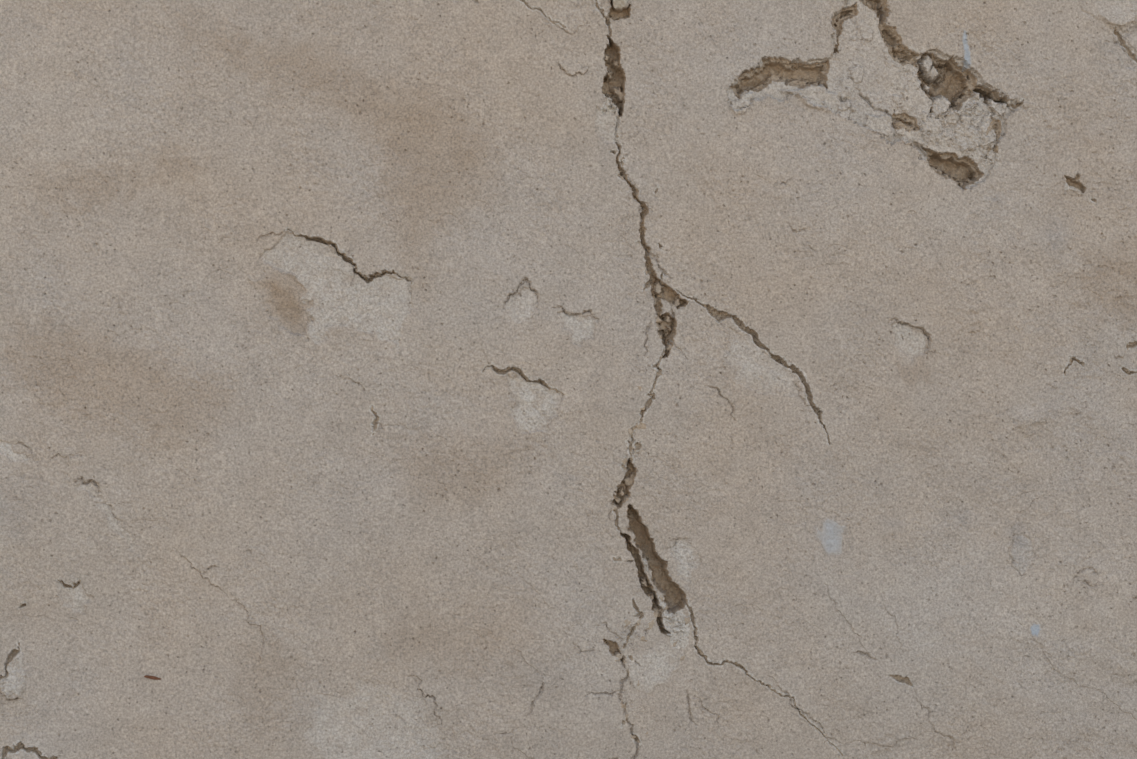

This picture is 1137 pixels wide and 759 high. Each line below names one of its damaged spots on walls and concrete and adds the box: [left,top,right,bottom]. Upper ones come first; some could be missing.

spalling [726,0,1030,191]
spalling [246,229,414,353]
crack [520,0,962,759]
flaking render [0,643,28,701]
crack [496,645,545,759]